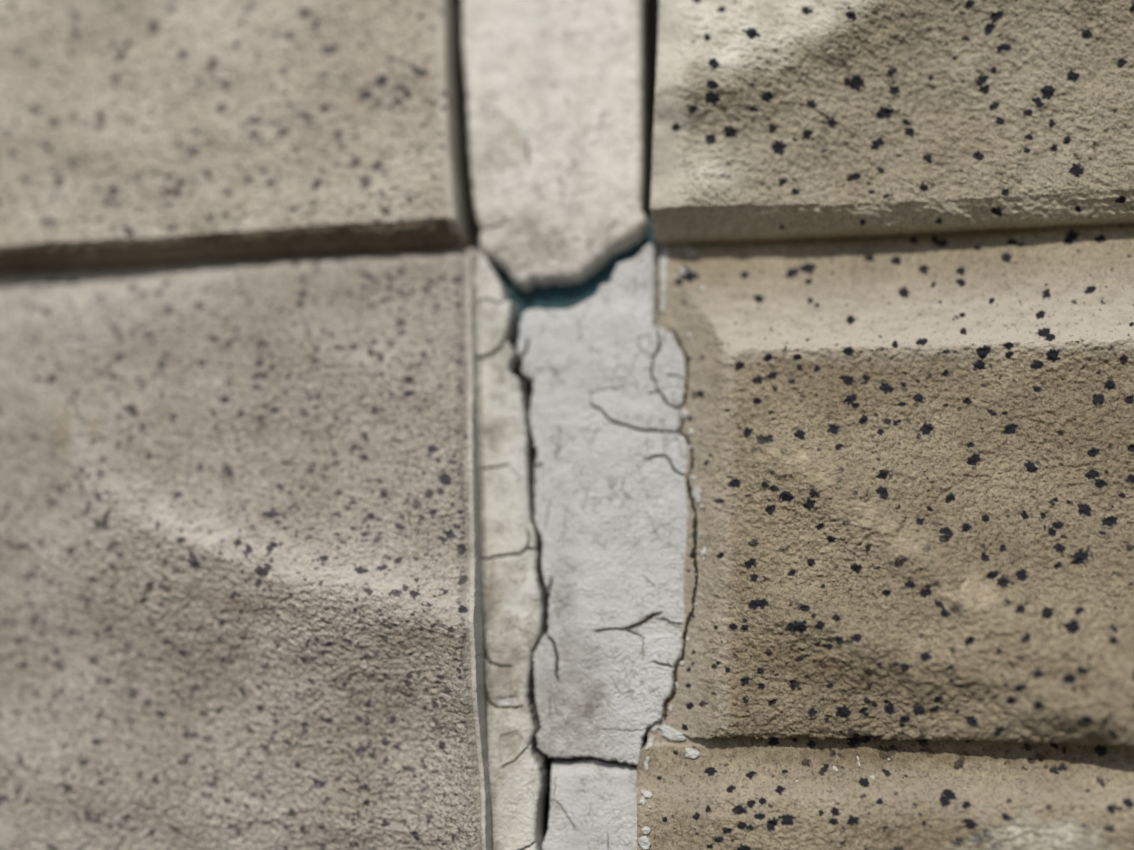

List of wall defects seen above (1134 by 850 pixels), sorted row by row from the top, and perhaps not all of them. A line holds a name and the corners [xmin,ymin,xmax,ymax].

crack [477,328,587,850]
crack [590,247,699,745]